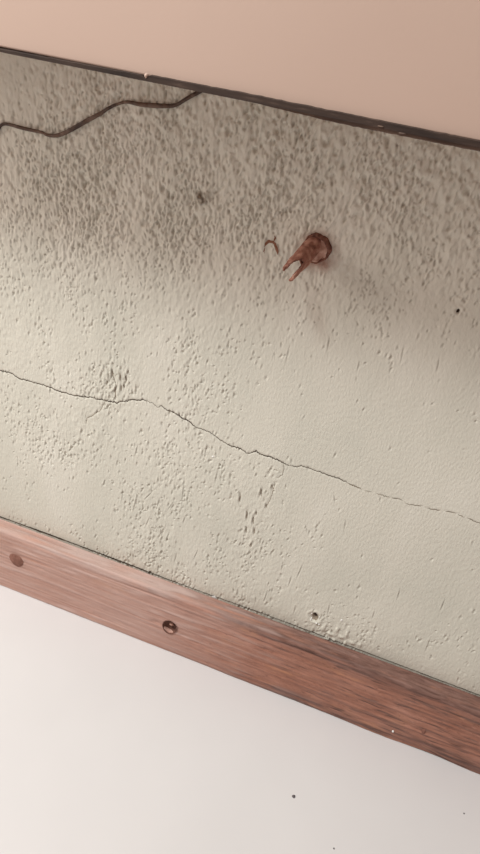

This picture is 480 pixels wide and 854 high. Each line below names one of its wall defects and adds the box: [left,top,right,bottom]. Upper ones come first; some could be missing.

crack [0,370,480,523]